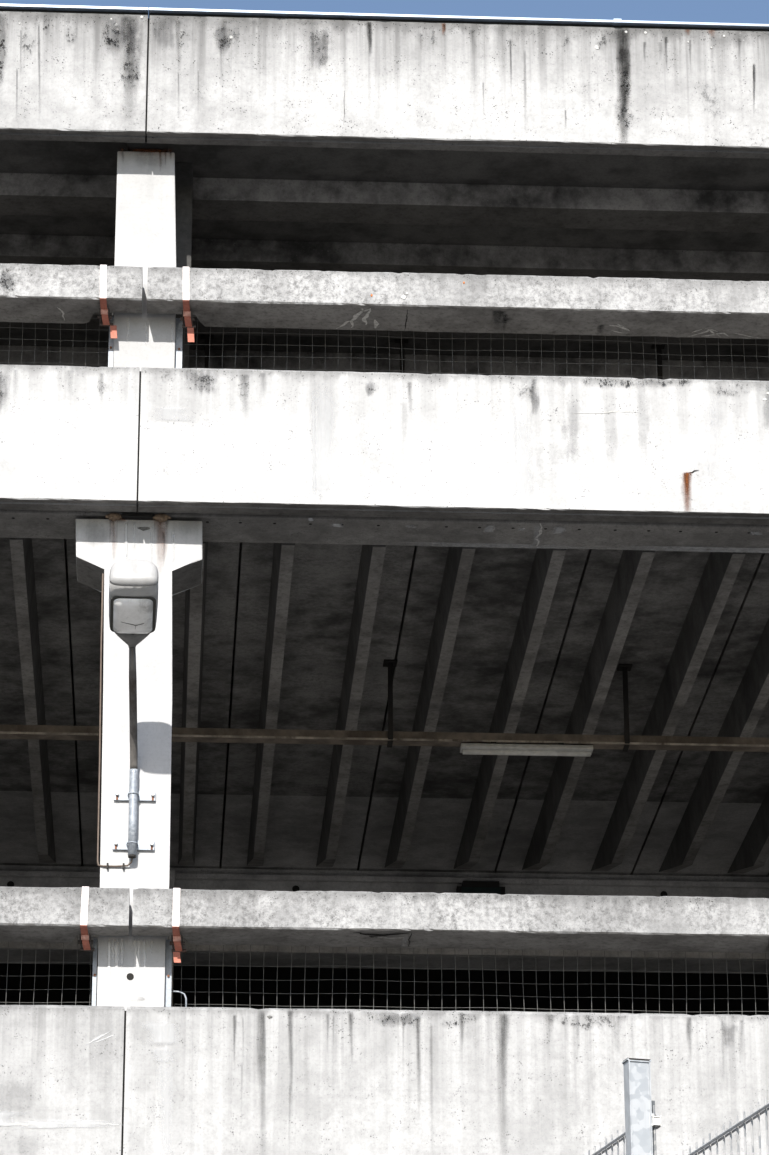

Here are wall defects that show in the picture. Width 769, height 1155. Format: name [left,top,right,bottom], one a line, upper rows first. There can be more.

damp [118,18,141,85]
damp [599,31,632,128]